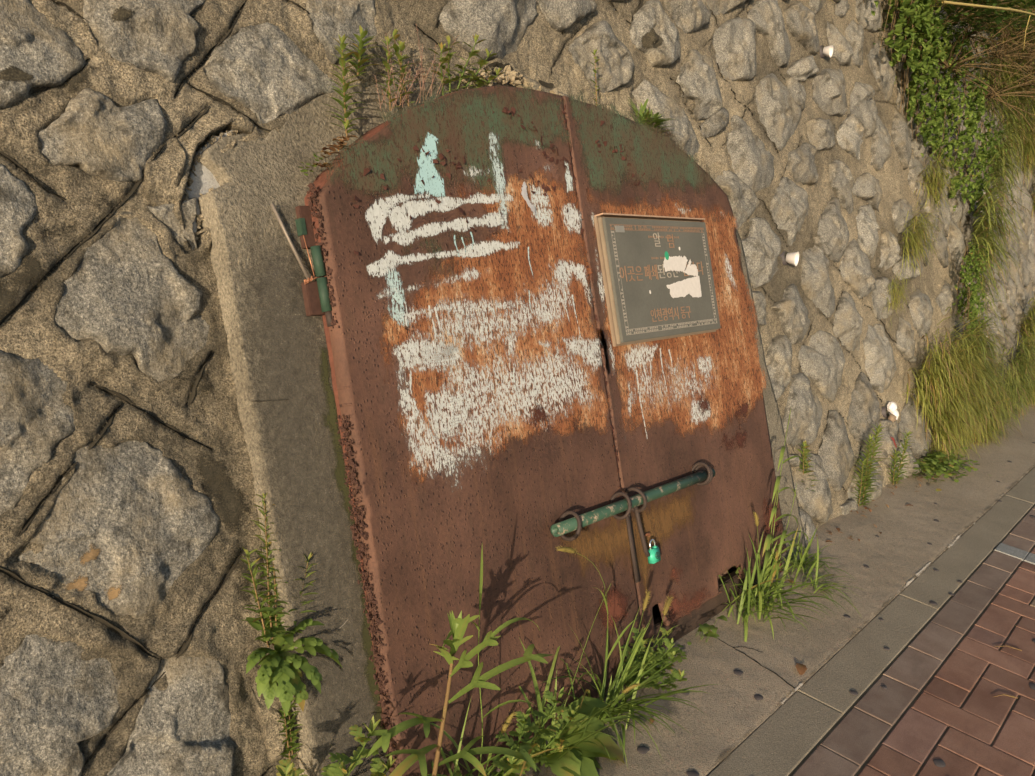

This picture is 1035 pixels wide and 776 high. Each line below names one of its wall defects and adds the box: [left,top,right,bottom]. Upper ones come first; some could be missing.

peeling [327,81,715,243]
rust [306,183,340,331]
rust [380,97,767,493]
rust [336,415,399,772]
rust [565,493,693,597]
crack [719,639,795,689]